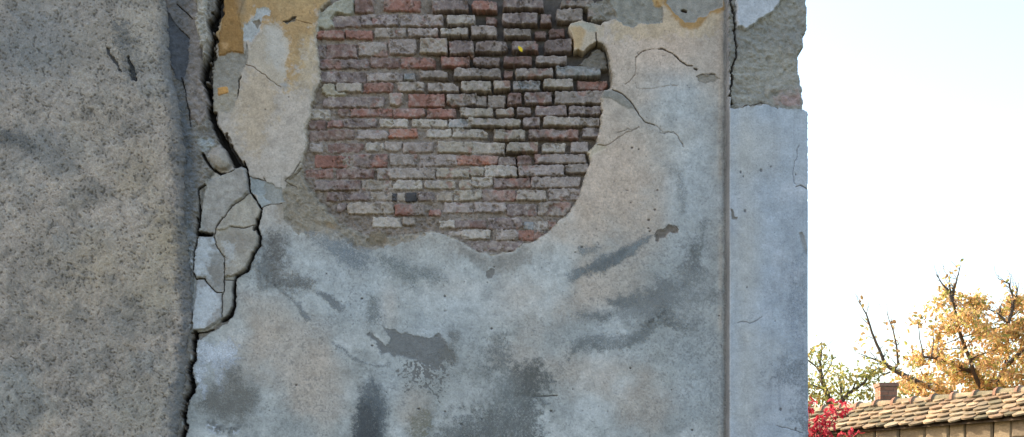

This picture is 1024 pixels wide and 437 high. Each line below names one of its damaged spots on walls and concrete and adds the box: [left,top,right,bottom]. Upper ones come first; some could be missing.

crack [597,48,698,147]
crack [729,0,738,106]
crack [182,0,301,437]
spalling [165,0,807,437]
leakage [568,222,715,360]